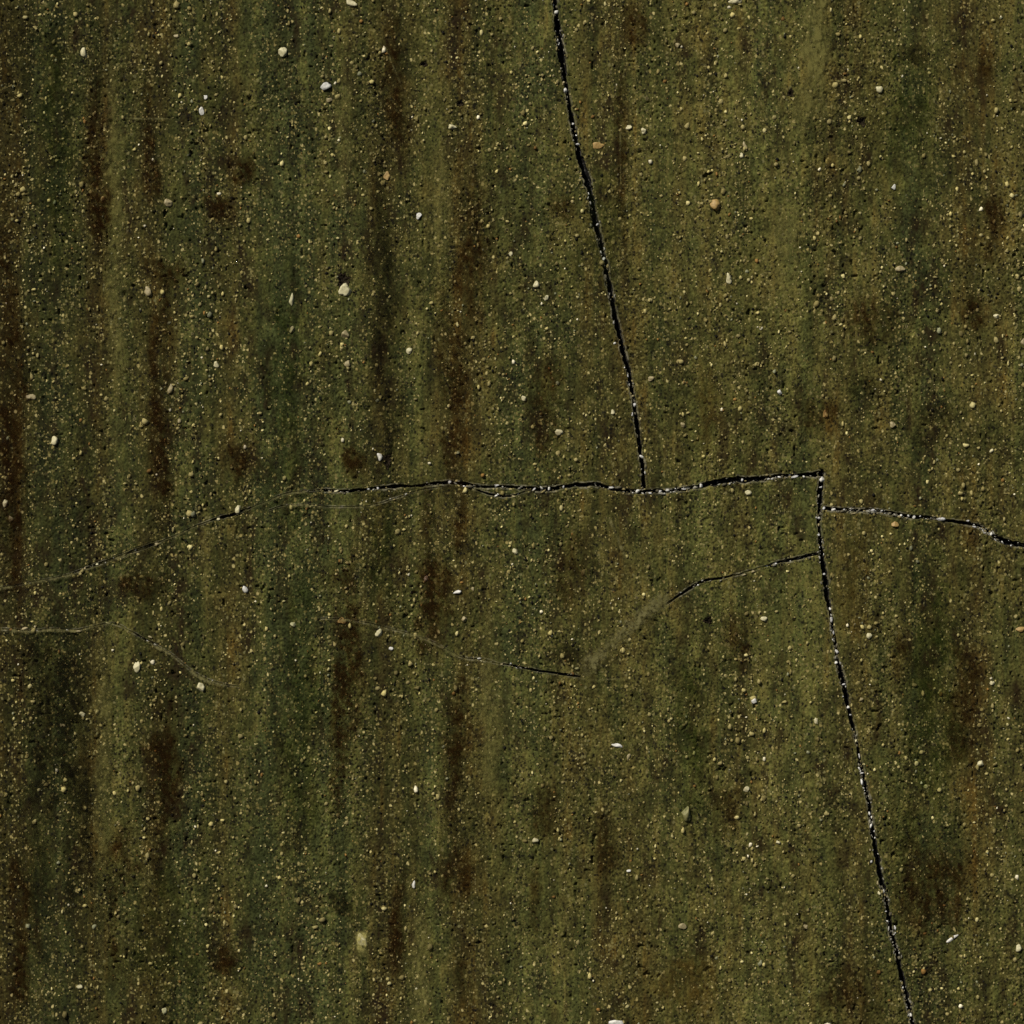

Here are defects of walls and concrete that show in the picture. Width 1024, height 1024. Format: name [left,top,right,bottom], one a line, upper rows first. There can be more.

crack [0,511,238,589]
crack [220,0,1024,1024]
crack [0,622,239,688]